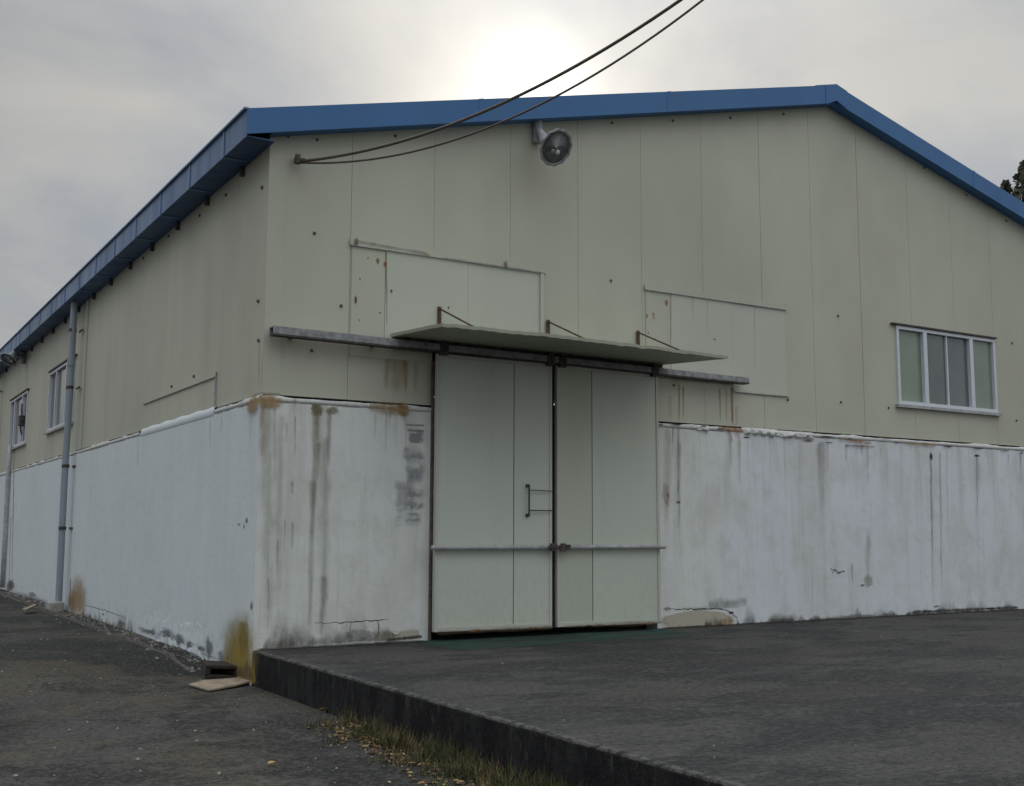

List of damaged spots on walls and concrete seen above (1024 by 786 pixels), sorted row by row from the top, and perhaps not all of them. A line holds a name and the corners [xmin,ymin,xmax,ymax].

corrosion [247,395,281,414]
water stain [312,405,337,432]
spalling [663,607,753,628]